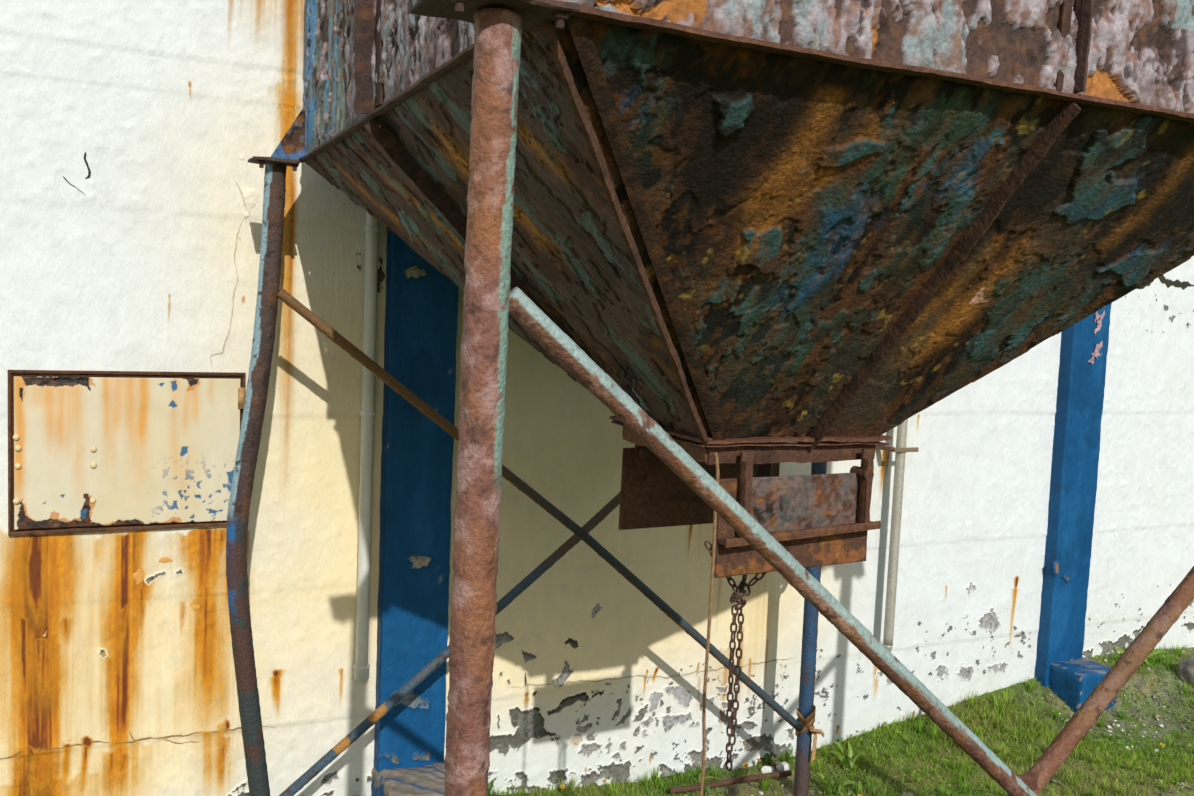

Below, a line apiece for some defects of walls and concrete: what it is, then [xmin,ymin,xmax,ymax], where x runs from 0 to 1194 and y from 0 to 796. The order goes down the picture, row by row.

corrosion [278,0,303,140]
corrosion [280,166,295,364]
peeling [1088,310,1107,364]
corrosion [0,530,153,796]
corrosion [180,528,230,787]
peeling [488,636,795,793]
peeling [814,649,838,723]
peeling [916,606,1032,683]
peeling [1082,594,1145,659]
peeling [1180,600,1194,638]
peeling [226,779,250,796]
peeling [298,768,372,796]